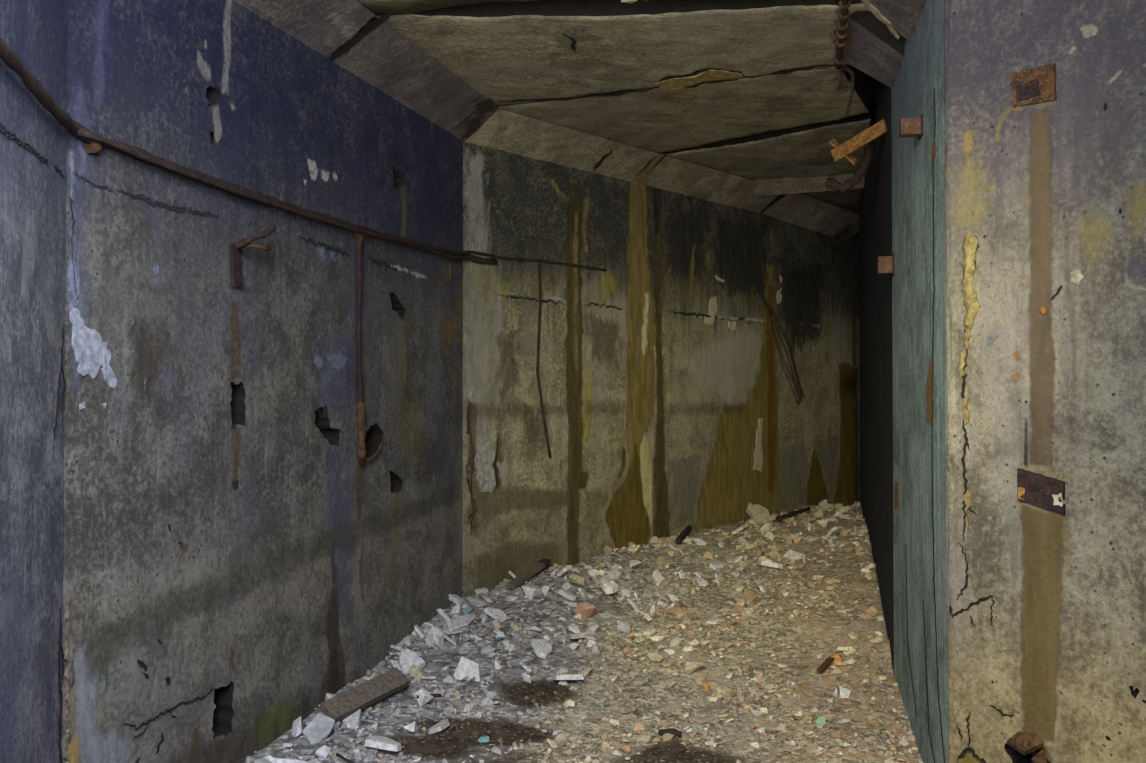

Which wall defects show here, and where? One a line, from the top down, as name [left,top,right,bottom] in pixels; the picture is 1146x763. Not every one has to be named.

crack [499,64,835,103]
crack [930,88,938,363]
peeling [44,248,118,388]
hole [314,405,340,447]
damp [465,154,517,439]
damp [469,180,592,592]
peeling [639,435,653,524]
damp [606,154,857,549]
crack [905,328,1024,763]
crack [124,688,216,740]
hole [212,681,234,738]
spalling [1004,743,1048,763]